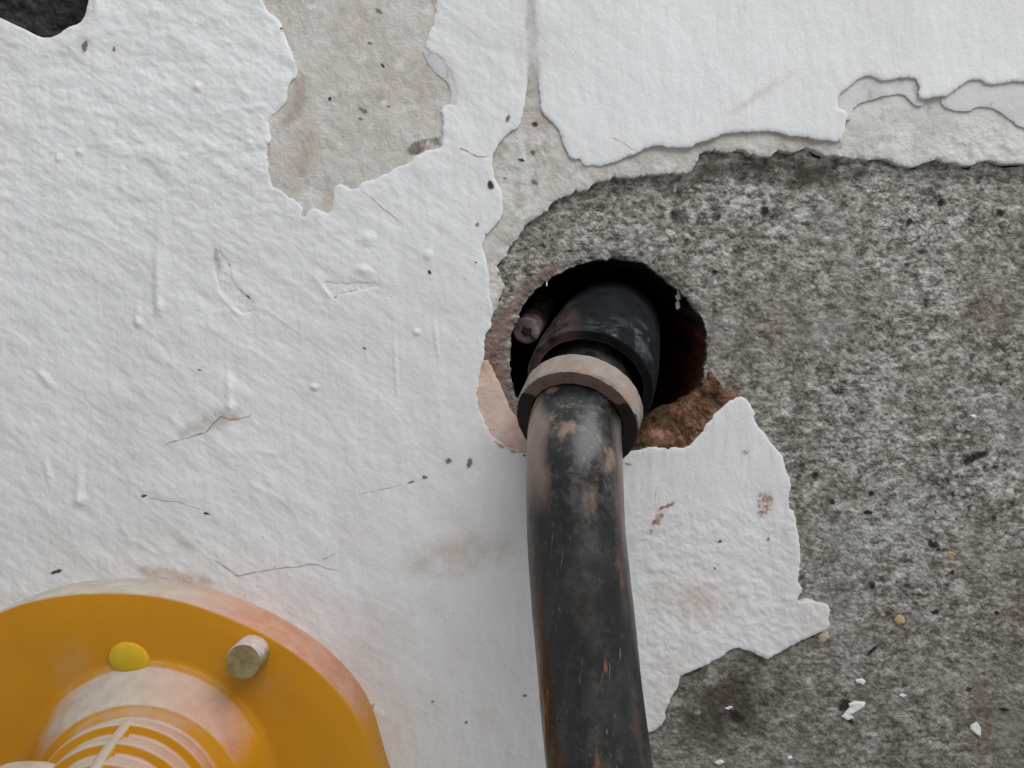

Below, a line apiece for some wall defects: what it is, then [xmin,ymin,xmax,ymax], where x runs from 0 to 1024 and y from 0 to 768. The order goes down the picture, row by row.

peeling [263,0,457,217]
crack [165,411,249,445]
spalling [475,65,1024,768]
crack [216,555,333,576]